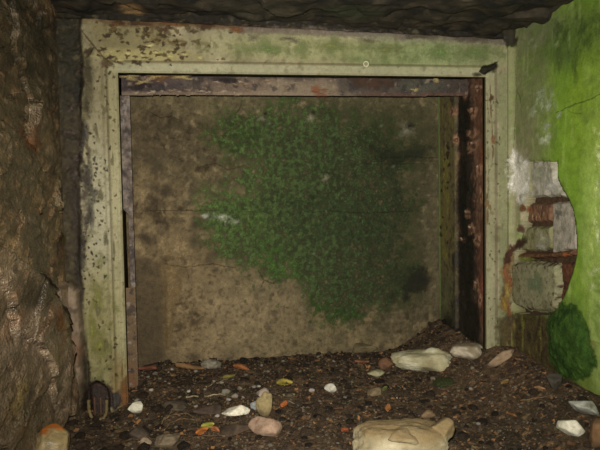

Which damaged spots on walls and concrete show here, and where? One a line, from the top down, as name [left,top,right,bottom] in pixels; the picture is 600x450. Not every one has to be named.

peeling [94,21,249,95]
peeling [83,126,115,281]
corrosion [476,82,493,186]
corrosion [501,204,527,316]
leakage [508,151,531,204]
spalling [510,161,577,315]